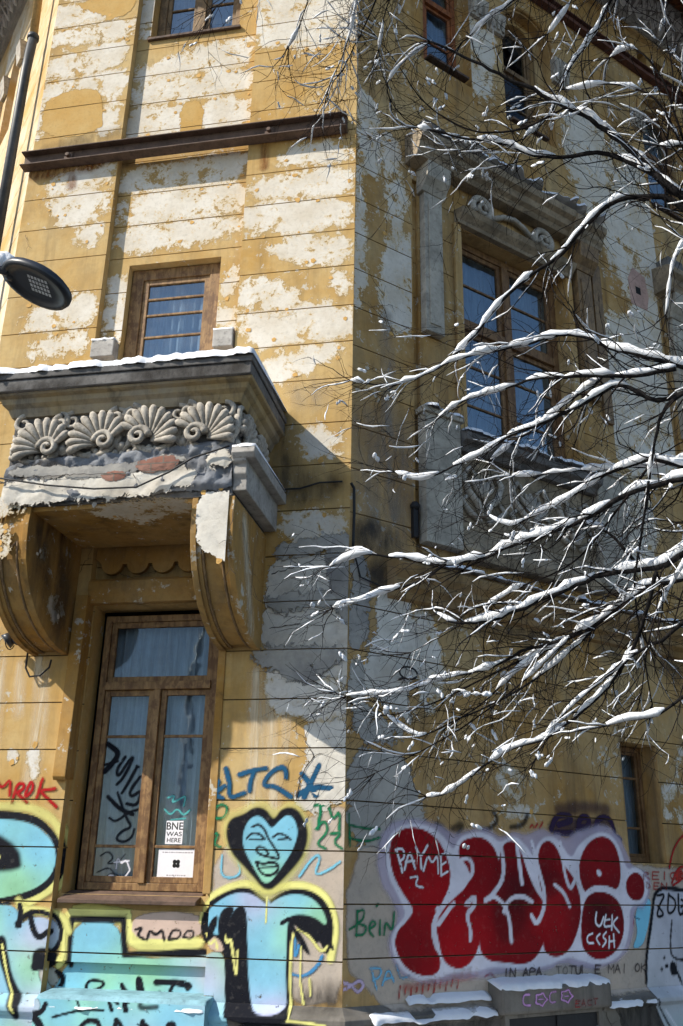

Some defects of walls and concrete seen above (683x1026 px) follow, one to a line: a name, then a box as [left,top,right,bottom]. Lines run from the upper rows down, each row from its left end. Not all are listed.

peeling [35,0,358,142]
peeling [37,84,412,388]
peeling [16,272,128,366]
flaking render [0,440,234,564]
peeling [46,593,65,625]
flaking render [250,502,447,850]
peeling [6,741,41,780]